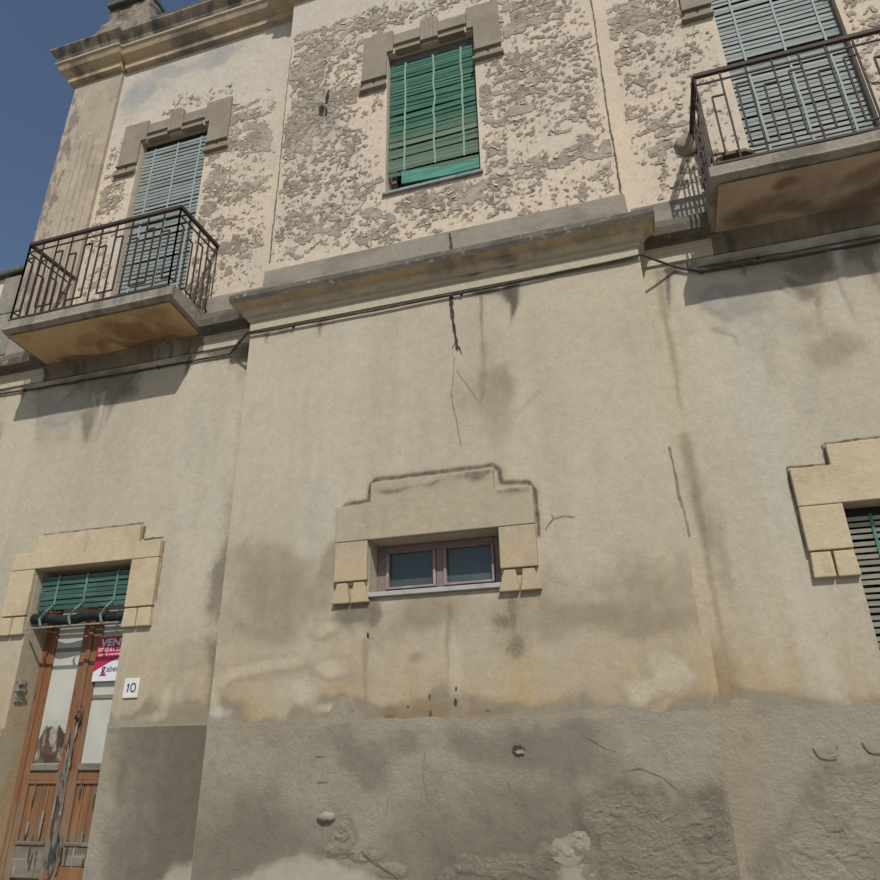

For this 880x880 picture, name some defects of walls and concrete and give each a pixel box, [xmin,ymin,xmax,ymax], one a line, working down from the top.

peeling [162,0,614,296]
peeling [607,0,740,200]
peeling [844,0,880,100]
peeling [76,142,131,301]
damp [659,228,880,345]
damp [0,365,146,449]
crack [449,293,477,442]
damp [336,462,542,535]
damp [109,487,880,725]
damp [209,844,388,880]
spalling [317,815,413,880]
spalling [551,831,591,867]